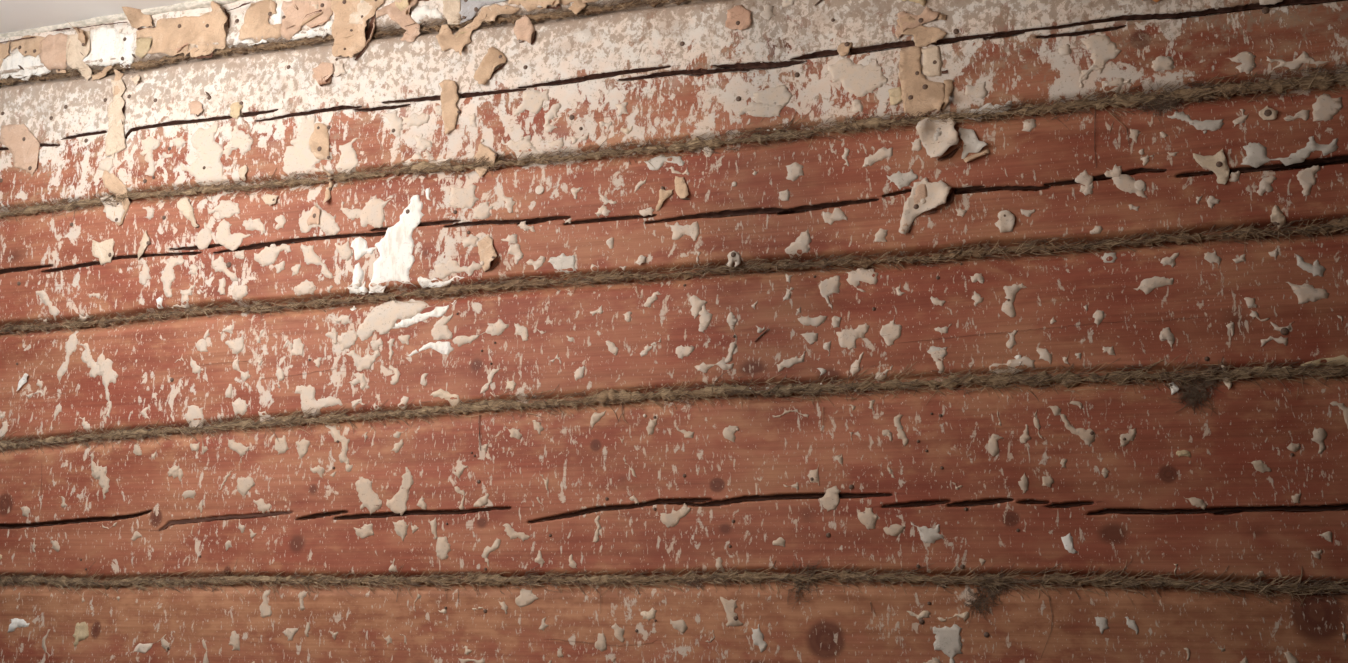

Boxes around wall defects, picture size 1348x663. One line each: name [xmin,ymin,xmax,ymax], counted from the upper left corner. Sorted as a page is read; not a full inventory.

crack [0,0,1342,150]
peeling [140,122,253,186]
peeling [282,115,358,178]
peeling [634,155,690,192]
peeling [842,147,918,189]
peeling [1075,164,1147,211]
crack [955,155,1348,194]
peeling [1229,94,1343,196]
peeling [139,195,391,309]
crack [0,189,912,274]
peeling [434,184,598,279]
crack [0,468,1348,531]